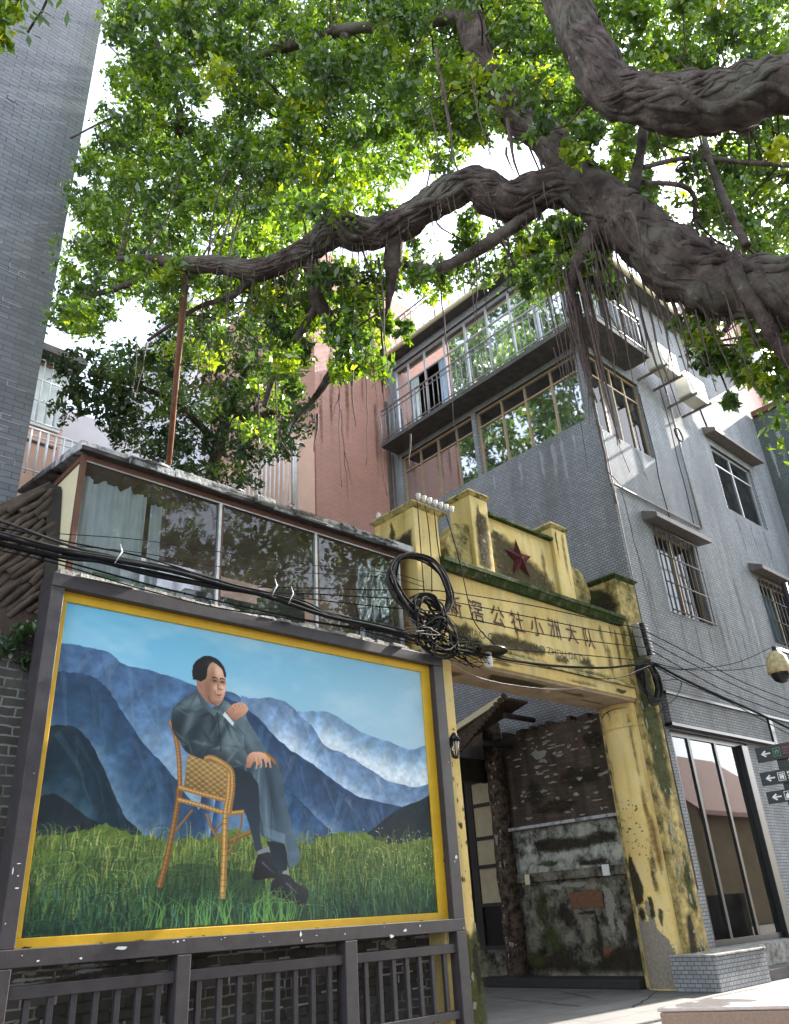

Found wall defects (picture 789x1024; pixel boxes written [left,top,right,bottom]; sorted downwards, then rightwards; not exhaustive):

water stain [476,506,555,592]
peeling [507,718,612,820]
water stain [548,882,587,890]
water stain [530,885,643,972]
peeling [621,800,675,990]